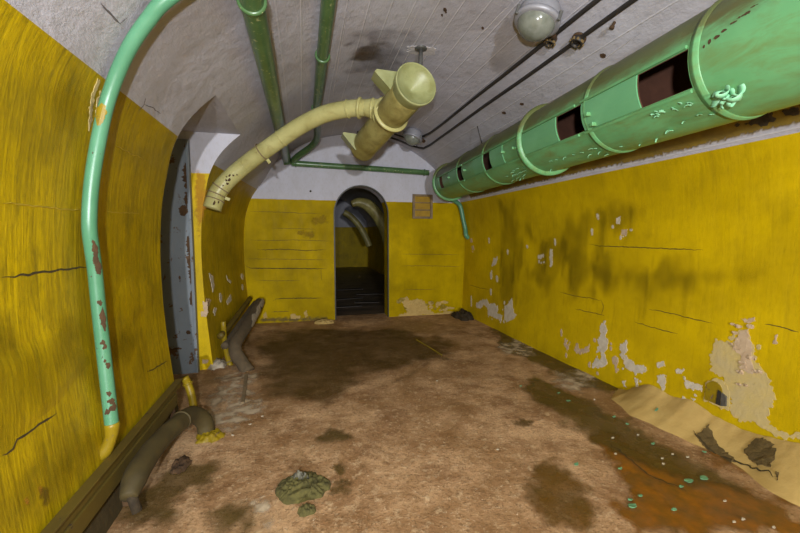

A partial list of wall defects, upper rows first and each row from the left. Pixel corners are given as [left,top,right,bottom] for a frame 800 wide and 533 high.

crack [101,3,125,24]
crack [2,266,86,278]
corrosion [179,236,192,305]
peeling [200,273,232,317]
peeling [397,297,455,317]
peeling [471,257,516,323]
leakage [260,318,448,399]
peeling [560,321,647,388]
peeling [657,361,666,391]
peeling [675,368,703,401]
peeling [709,317,800,480]
crack [4,413,57,455]